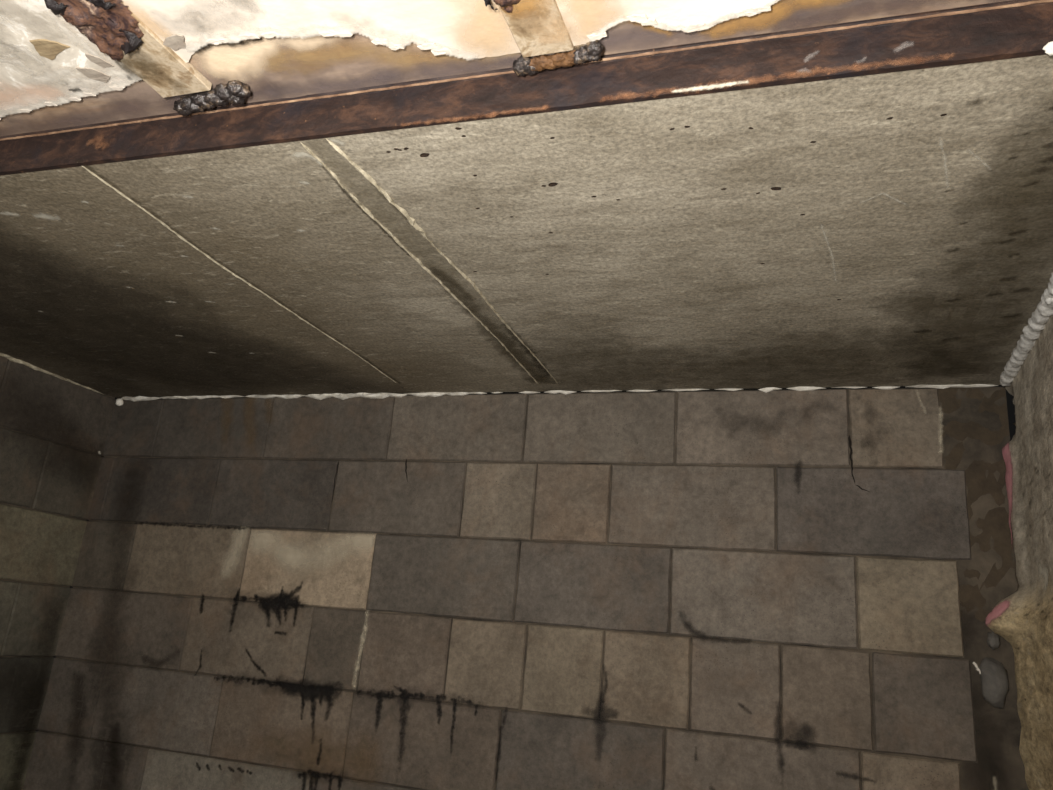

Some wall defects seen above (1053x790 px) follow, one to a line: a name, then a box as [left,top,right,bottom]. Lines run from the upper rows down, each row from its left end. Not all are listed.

peeling [0,0,144,120]
flaking render [163,26,473,60]
corrosion [262,44,495,97]
corrosion [468,0,540,48]
flaking render [587,0,779,41]
peeling [673,81,748,92]
damp [907,145,1053,370]
damp [230,585,303,635]
damp [217,649,342,790]
damp [357,688,478,757]